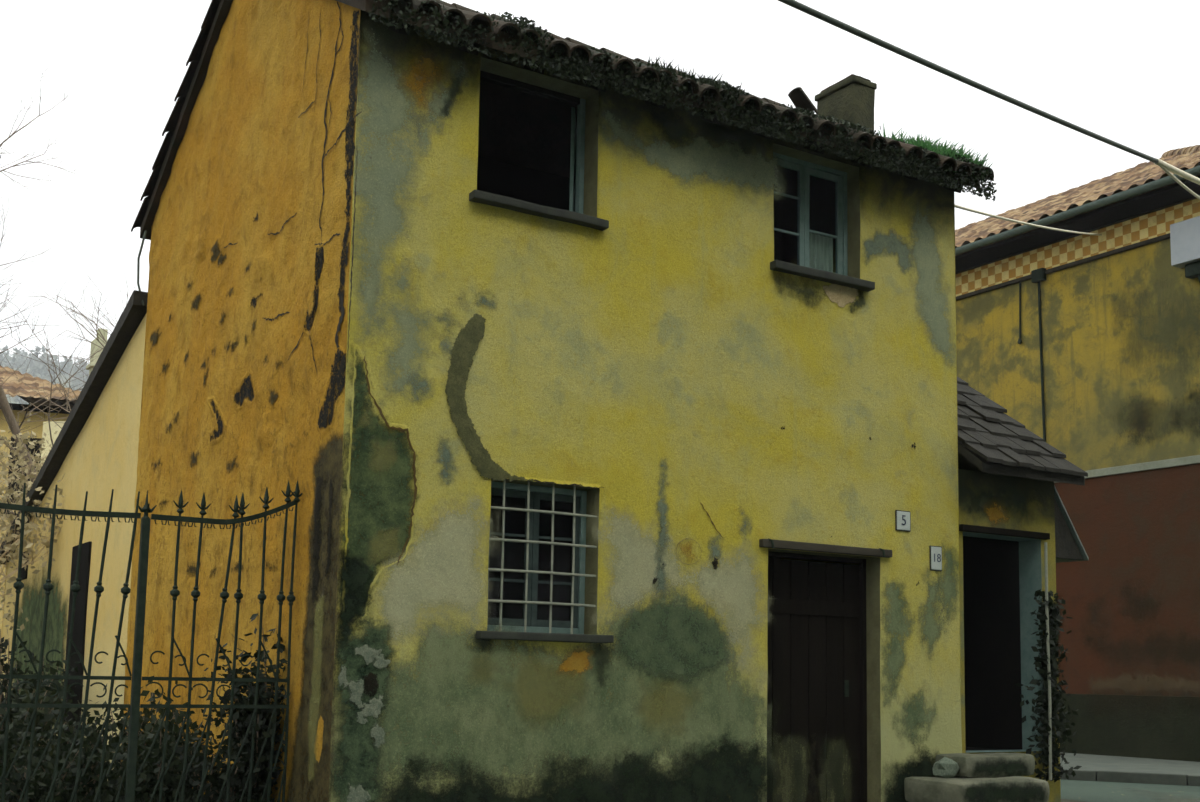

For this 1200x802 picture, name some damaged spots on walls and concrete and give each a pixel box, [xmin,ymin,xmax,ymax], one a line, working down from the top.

crack [268,1,362,363]
flaking render [190,240,773,802]
leakage [1118,394,1200,438]
leakage [376,741,775,802]
leakage [595,643,611,686]
leakage [882,545,959,802]